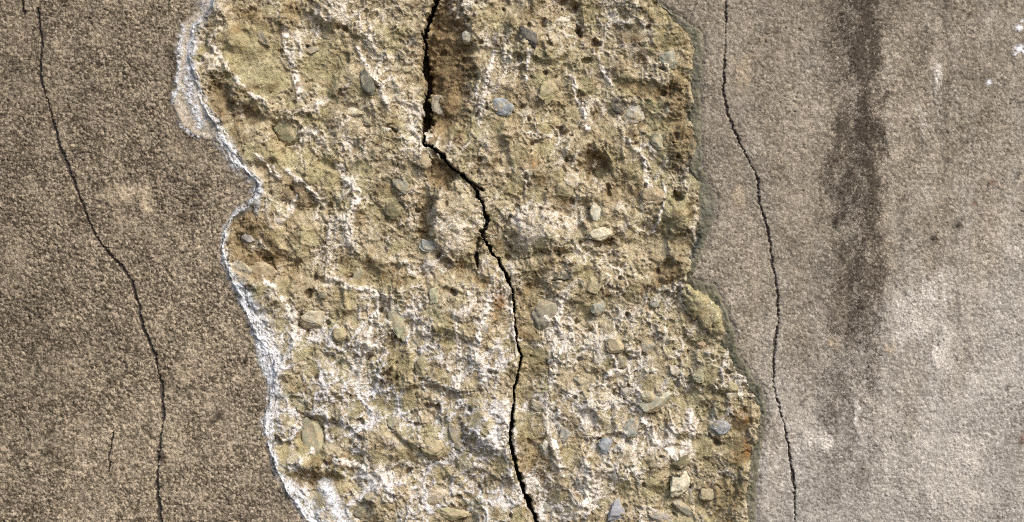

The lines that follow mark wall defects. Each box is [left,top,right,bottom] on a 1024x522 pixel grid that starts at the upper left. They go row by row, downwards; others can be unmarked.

crack [21,0,165,522]
water stain [186,0,350,522]
water stain [334,162,362,248]
water stain [332,455,392,492]
spalling [172,0,766,522]
water stain [452,296,494,391]
crack [421,0,538,522]
water stain [498,399,520,496]
water stain [543,293,570,477]
water stain [636,399,695,461]
crack [722,2,796,515]
water stain [819,0,960,383]